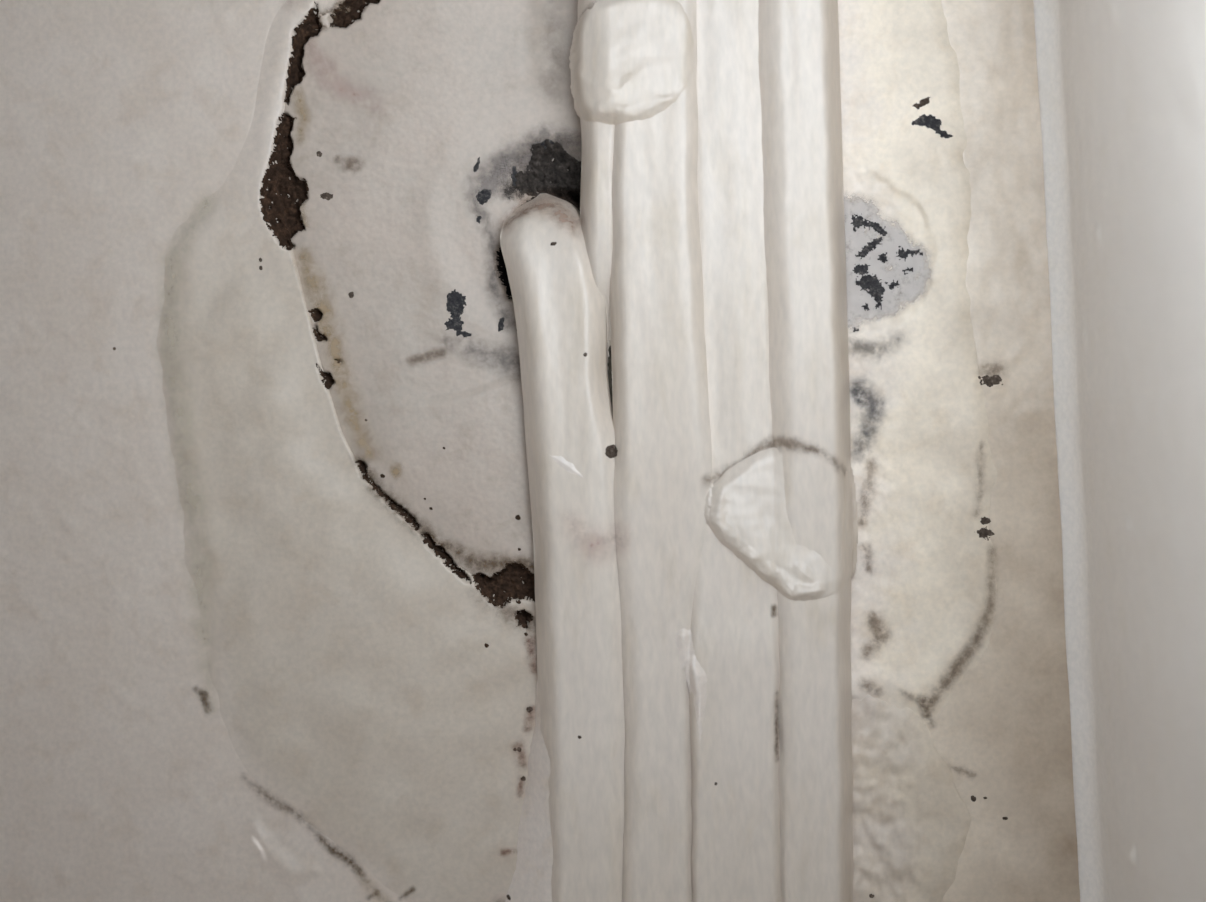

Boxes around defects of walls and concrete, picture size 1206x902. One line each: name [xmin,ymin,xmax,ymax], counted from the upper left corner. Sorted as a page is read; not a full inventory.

spalling [281,0,582,584]
damp [473,139,575,224]
peeling [838,0,1003,724]